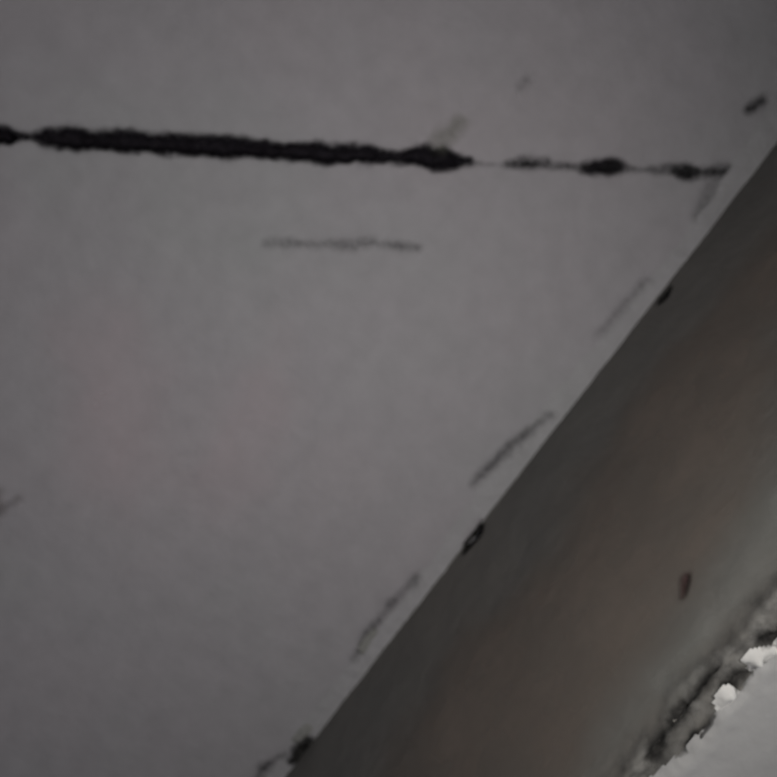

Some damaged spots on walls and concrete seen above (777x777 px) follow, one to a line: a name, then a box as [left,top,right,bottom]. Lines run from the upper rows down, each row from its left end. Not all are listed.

crack [0,126,472,172]
crack [507,159,541,167]
crack [582,158,624,175]
crack [653,164,720,180]
spalling [623,582,777,777]